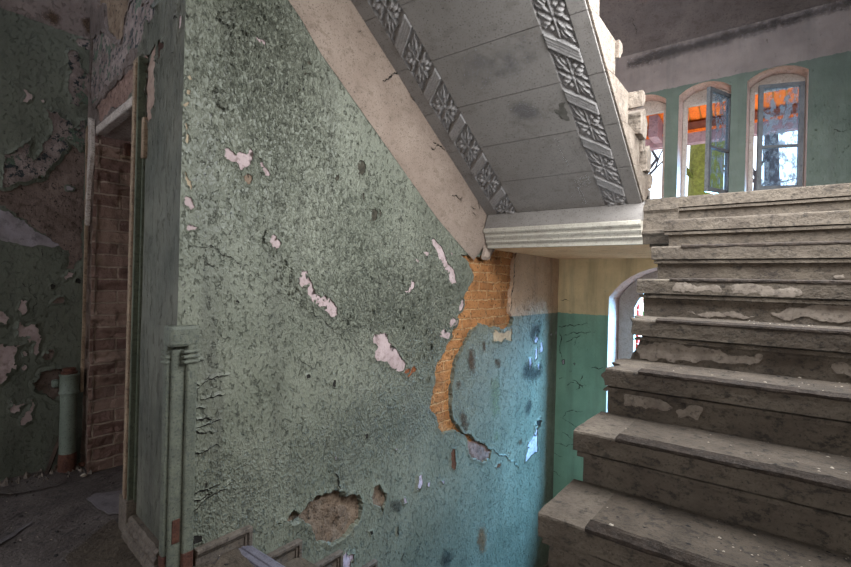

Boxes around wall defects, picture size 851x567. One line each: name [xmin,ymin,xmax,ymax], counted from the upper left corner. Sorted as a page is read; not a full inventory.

spalling [0,0,167,291]
peeling [219,143,273,188]
peeling [294,265,341,321]
peeling [672,282,851,323]
peeling [0,296,68,429]
peeling [370,327,418,381]
spalling [413,234,518,473]
peeling [635,342,763,365]
crack [195,356,230,454]
peeling [624,394,703,420]
crack [194,479,232,511]
spalling [272,480,389,567]